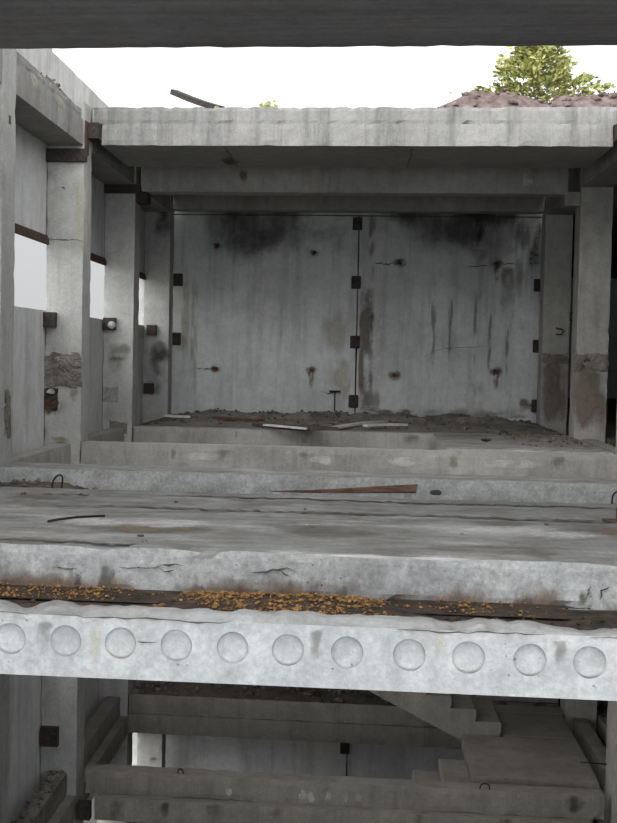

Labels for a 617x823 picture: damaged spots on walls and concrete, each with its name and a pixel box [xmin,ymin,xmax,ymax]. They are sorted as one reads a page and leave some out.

water stain [221,212,299,254]
water stain [391,213,515,246]
spalling [44,352,82,413]
water stain [544,358,605,427]
crack [0,537,147,545]
crack [120,564,183,572]
crack [251,567,294,576]